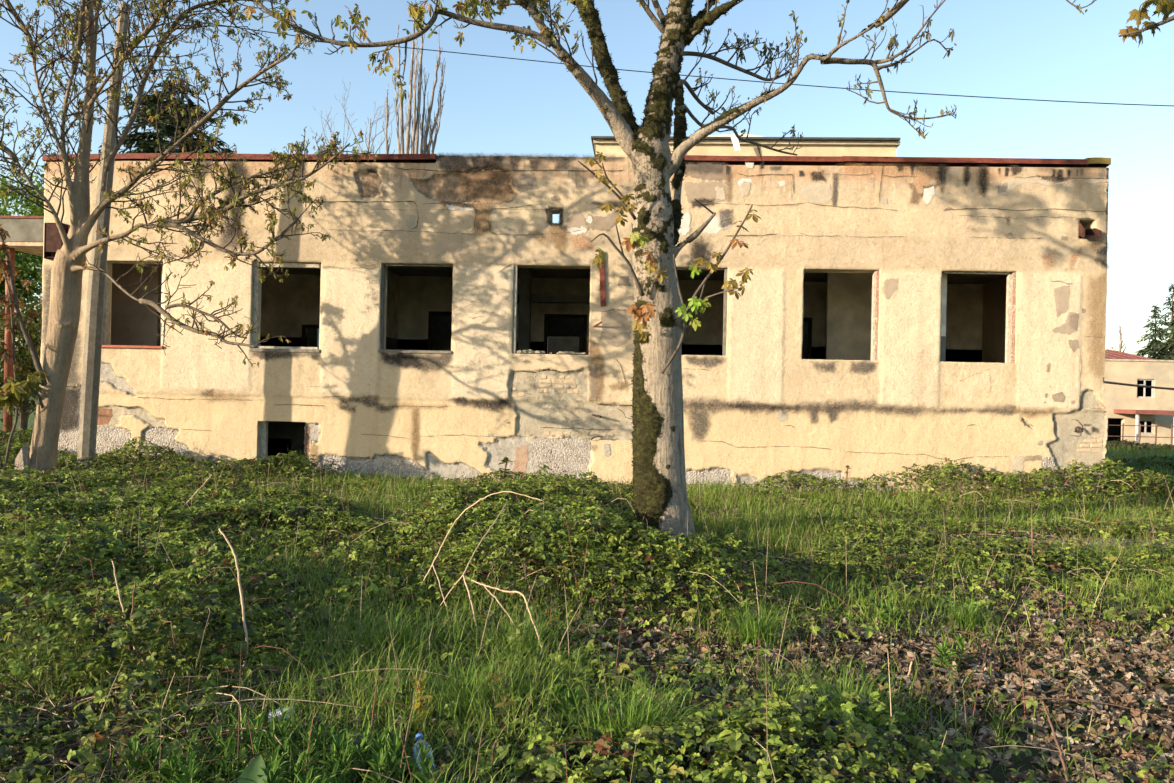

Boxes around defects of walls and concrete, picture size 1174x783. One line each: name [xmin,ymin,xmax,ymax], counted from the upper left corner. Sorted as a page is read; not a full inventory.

spalling [411,168,537,233]
peeling [679,162,754,235]
leakage [897,164,946,204]
leakage [964,164,1021,194]
leakage [382,353,452,371]
spalling [57,385,82,463]
spalling [95,362,190,463]
spalling [304,368,633,483]
leakage [454,398,511,411]
leakage [683,399,922,439]
leakage [942,407,1053,415]
spalling [1010,389,1108,496]